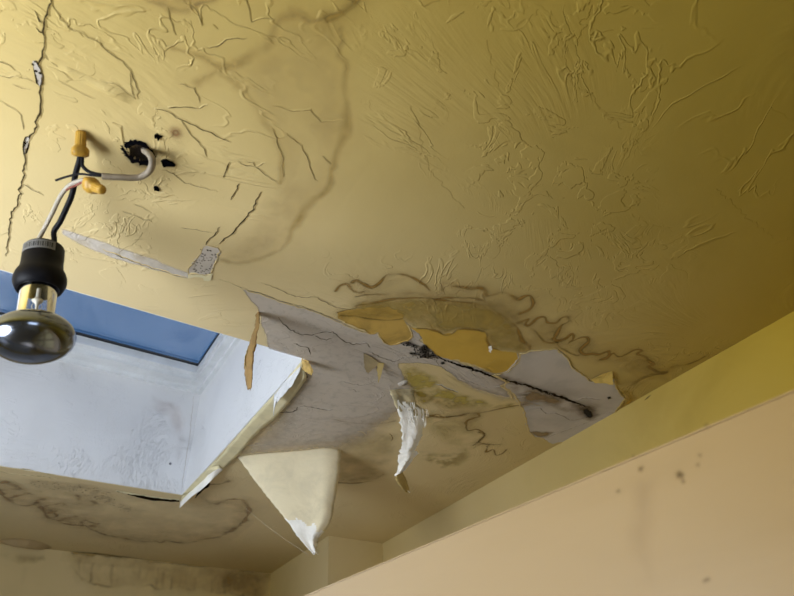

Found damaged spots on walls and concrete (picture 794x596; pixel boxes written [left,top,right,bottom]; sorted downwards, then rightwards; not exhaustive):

crack [189,0,276,49]
crack [0,0,231,256]
crack [162,128,331,245]
peeling [63,230,221,281]
leakage [335,277,419,314]
crack [219,279,618,420]
leakage [401,342,445,364]
leakage [433,286,667,376]
crack [116,396,210,503]
peeling [179,288,626,555]